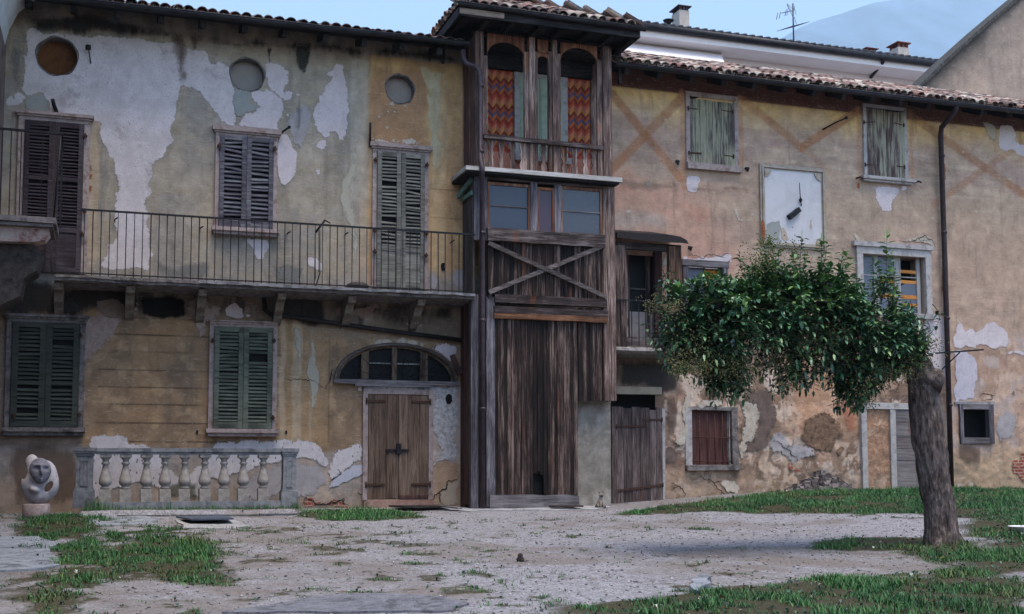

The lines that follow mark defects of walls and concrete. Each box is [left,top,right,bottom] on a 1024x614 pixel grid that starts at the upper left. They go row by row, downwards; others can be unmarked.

flaking render [6,27,350,270]
flaking render [998,125,1024,156]
flaking render [875,186,907,212]
flaking render [187,297,251,339]
flaking render [924,316,1024,401]
flaking render [87,431,362,508]
flaking render [433,386,459,466]
flaking render [739,388,844,472]
flaking render [1013,453,1024,481]